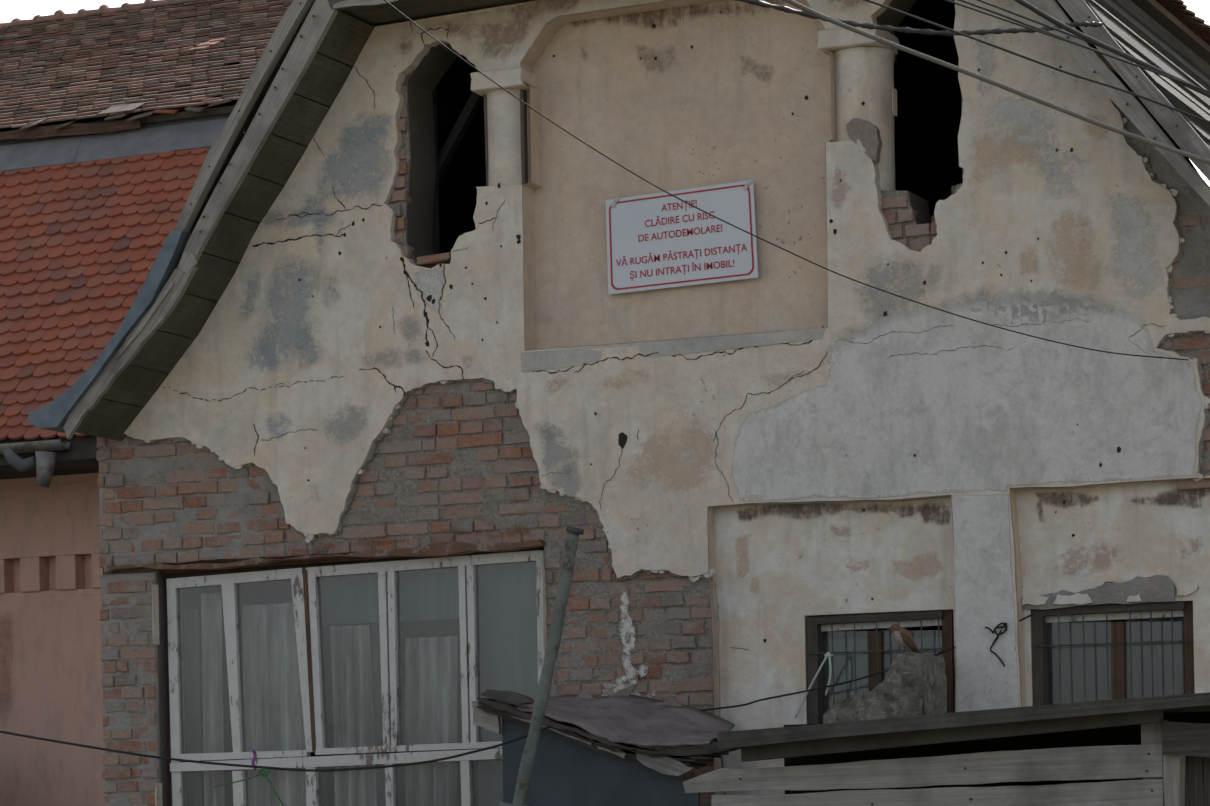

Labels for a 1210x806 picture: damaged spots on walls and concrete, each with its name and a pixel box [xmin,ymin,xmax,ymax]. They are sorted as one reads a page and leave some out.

crack [252,187,382,247]
crack [392,249,465,380]
crack [163,368,406,401]
crack [253,424,317,455]
crack [532,318,1090,501]
peeling [732,101,1210,712]
spalling [96,378,726,806]